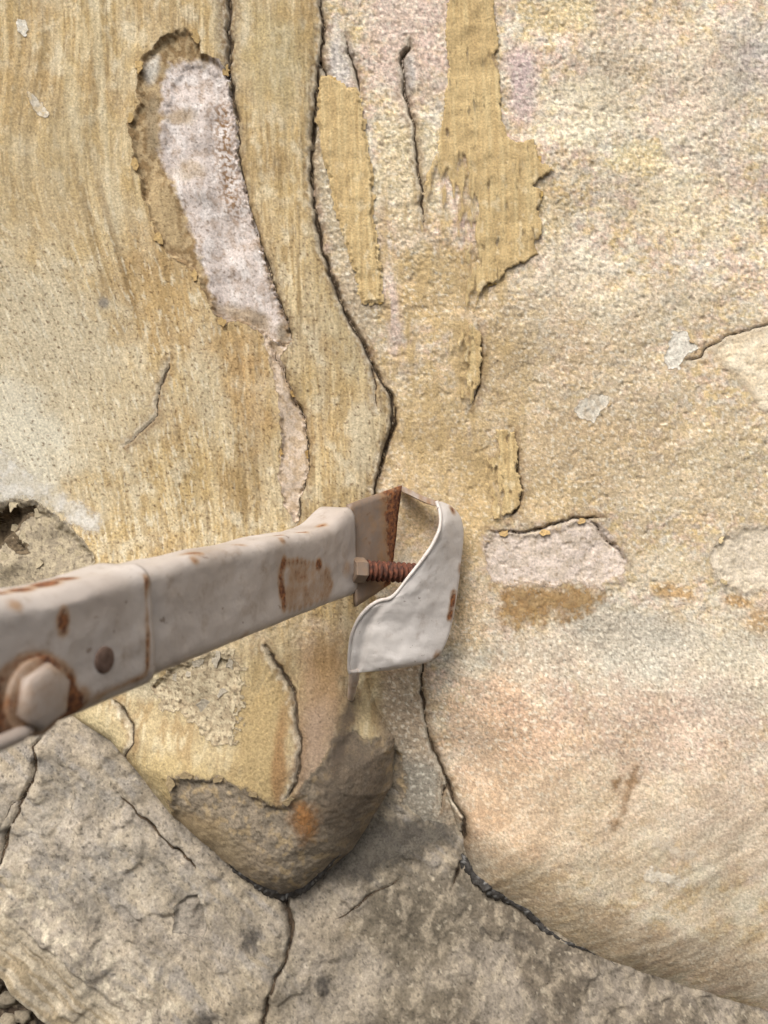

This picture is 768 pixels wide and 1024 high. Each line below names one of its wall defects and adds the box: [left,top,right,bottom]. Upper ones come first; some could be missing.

peeling [127,28,309,523]
peeling [315,75,384,306]
crack [310,0,397,495]
crack [400,46,424,225]
peeling [424,0,554,405]
spalling [0,498,95,588]
peeling [483,429,627,590]
crack [0,740,39,865]
crack [121,797,196,868]
spalling [150,648,249,746]
crack [420,663,467,838]
crack [262,902,295,1024]